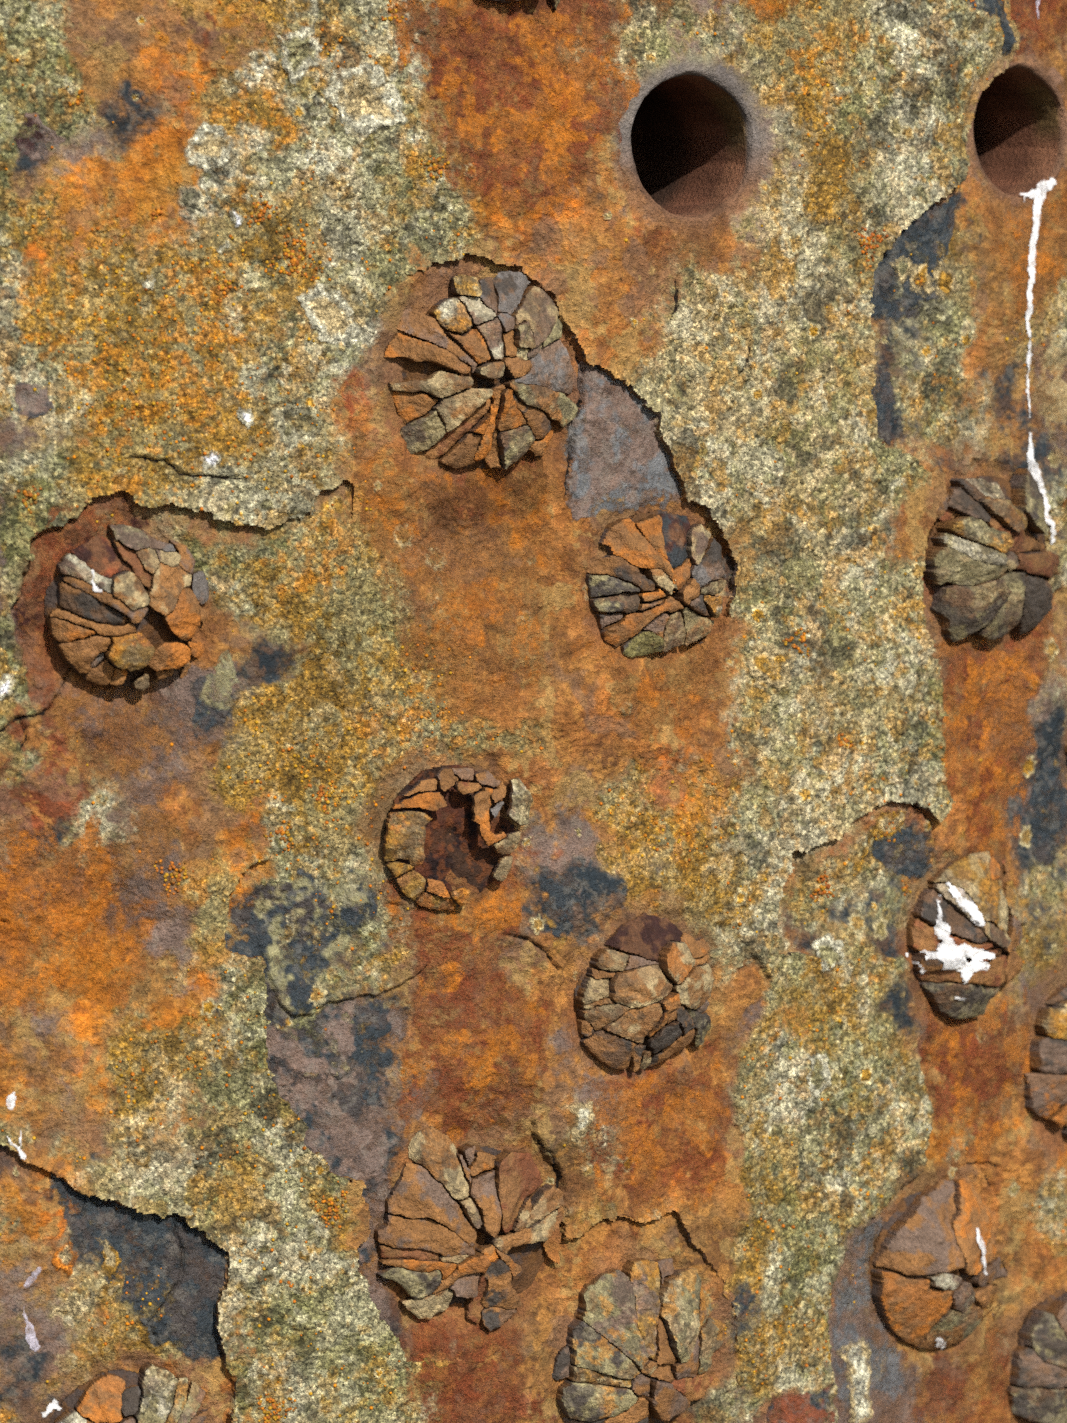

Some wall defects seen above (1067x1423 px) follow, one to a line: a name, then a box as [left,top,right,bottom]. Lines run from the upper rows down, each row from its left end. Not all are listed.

spalling [870,189,961,322]
rust [383,271,579,486]
spalling [564,362,682,521]
spalling [871,372,899,446]
leakage [1032,334,1067,461]
rust [585,513,726,658]
spalling [872,825,933,879]
rust [906,468,1067,1165]
rust [374,767,564,1423]
spalling [50,1175,227,1360]
rust [552,1258,726,1423]
rust [870,1178,1008,1350]